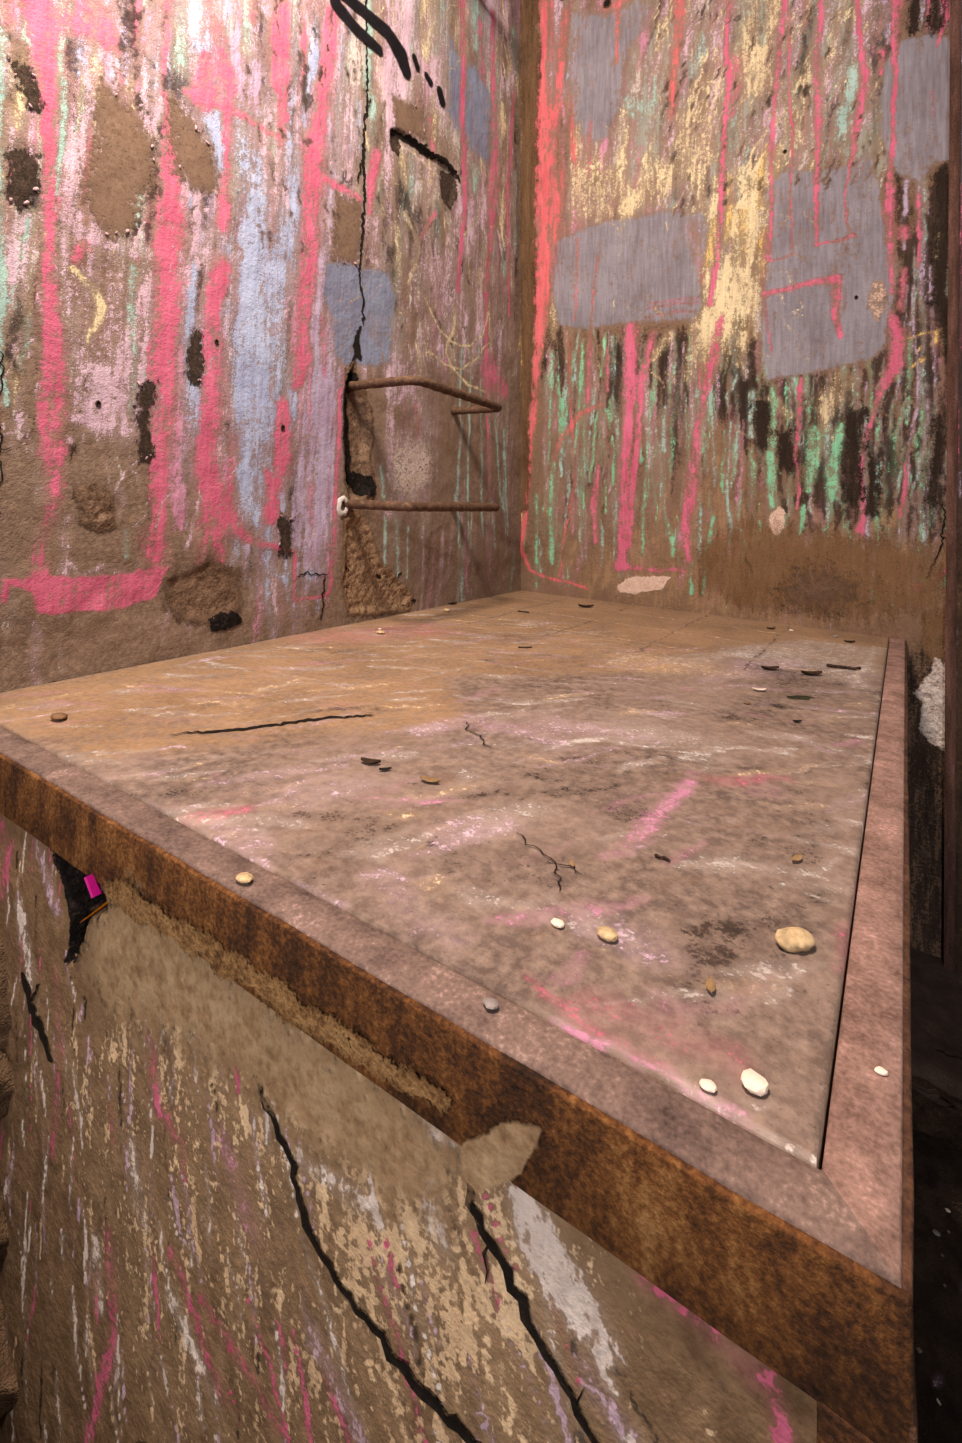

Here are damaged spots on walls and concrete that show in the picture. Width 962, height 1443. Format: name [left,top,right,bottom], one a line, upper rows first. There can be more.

peeling [75,73,221,246]
crack [345,0,461,387]
flaking render [161,556,243,627]
flaking render [341,512,414,618]
crack [172,714,372,735]
crack [253,1074,476,1443]
crack [465,1182,597,1443]